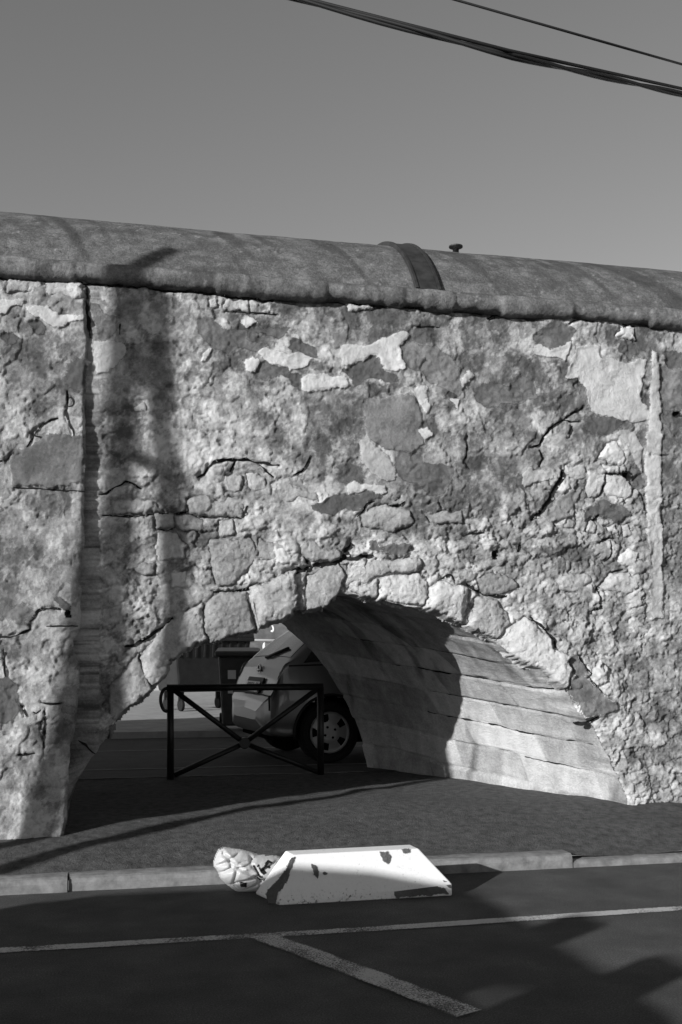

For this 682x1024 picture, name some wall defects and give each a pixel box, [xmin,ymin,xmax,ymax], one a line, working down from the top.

flaking render [342,355,399,387]
peeling [400,341,538,408]
crack [0,390,75,462]
crack [13,455,311,531]
flaking render [110,472,342,589]
peeling [363,393,454,496]
flaking render [361,504,463,533]
crack [530,407,584,521]
flaking render [553,518,638,595]
crack [0,607,78,756]